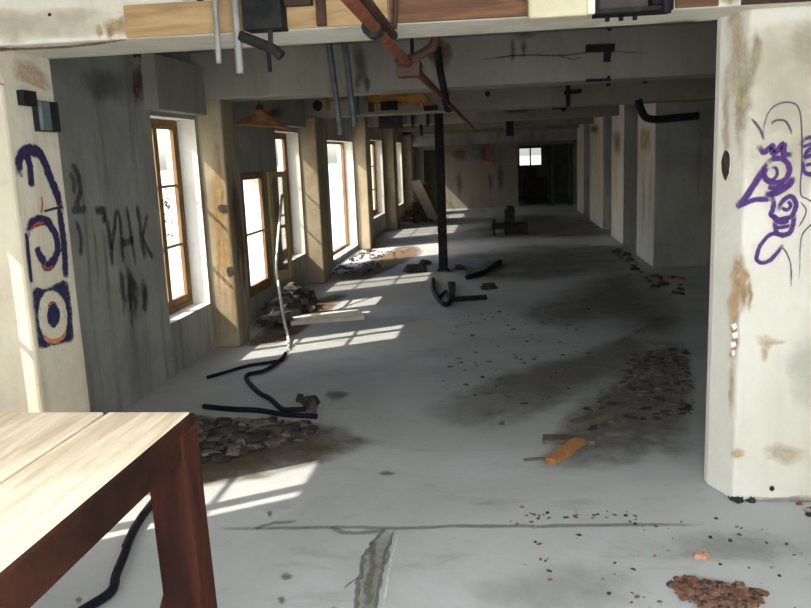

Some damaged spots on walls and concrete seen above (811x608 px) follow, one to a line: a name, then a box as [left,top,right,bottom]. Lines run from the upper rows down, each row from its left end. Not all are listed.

peeling [17,64,45,88]
peeling [730,323,738,357]
crack [255,521,657,608]